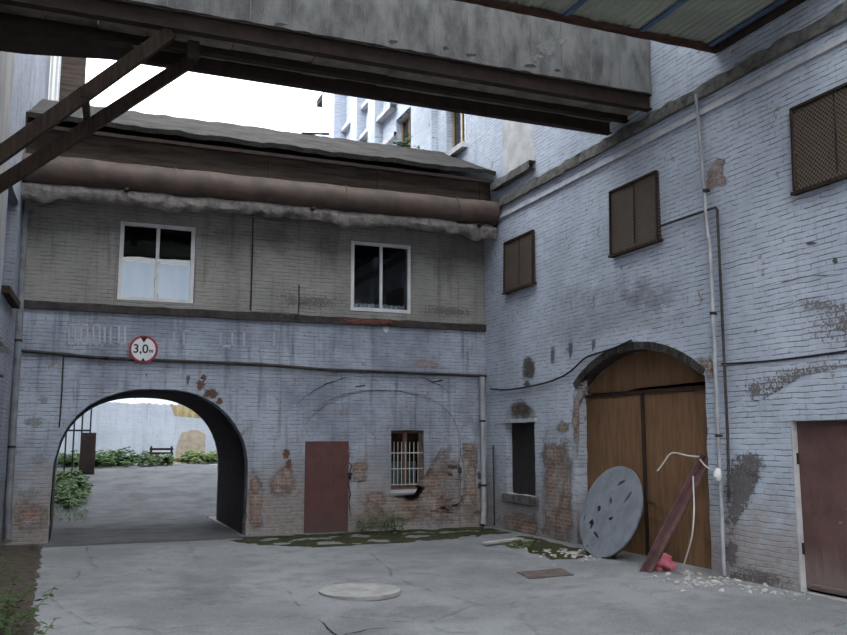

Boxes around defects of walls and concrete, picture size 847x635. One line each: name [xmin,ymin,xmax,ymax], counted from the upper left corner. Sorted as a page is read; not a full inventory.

flaking render [363,447,462,524]
flaking render [504,380,588,542]